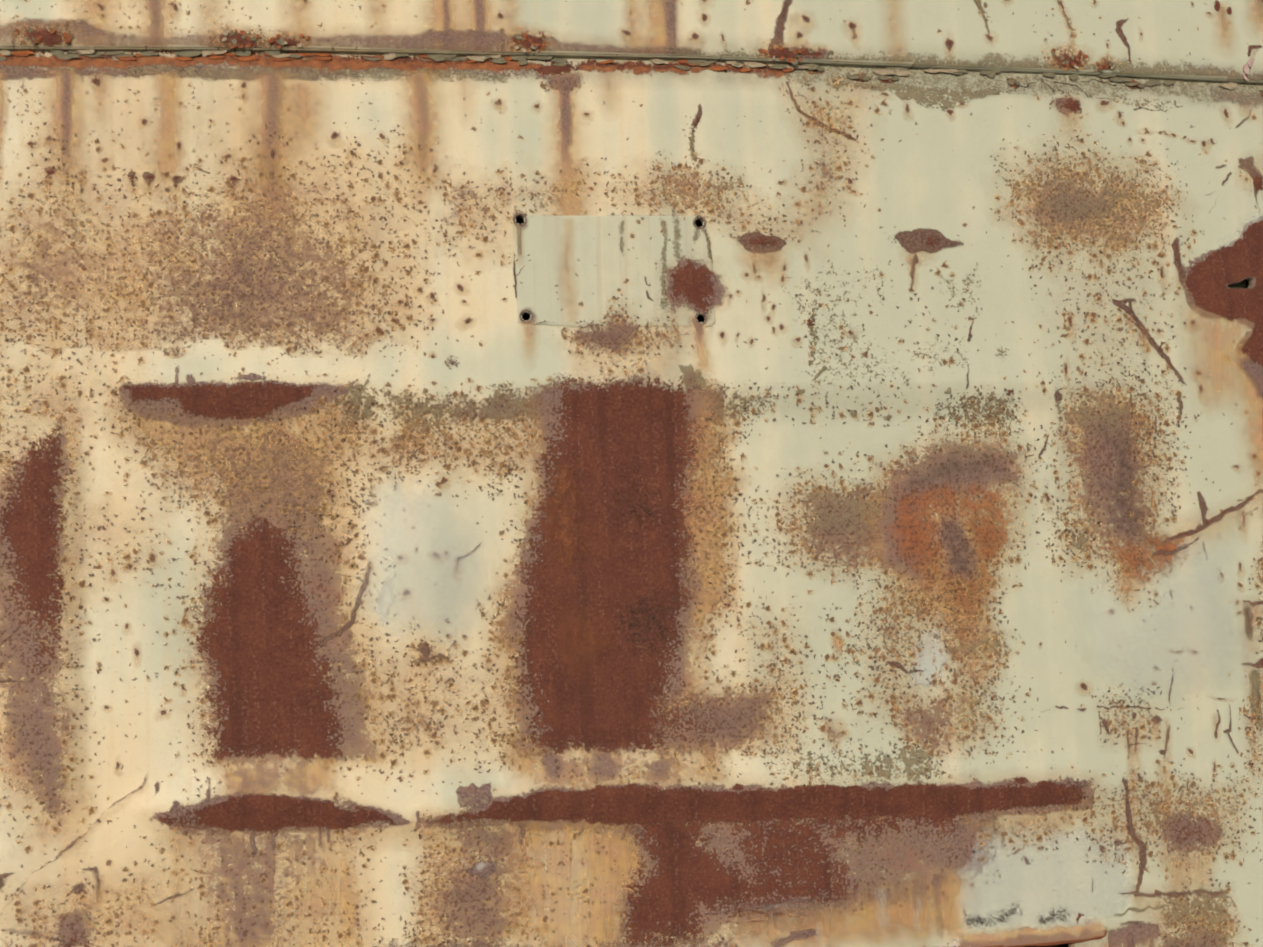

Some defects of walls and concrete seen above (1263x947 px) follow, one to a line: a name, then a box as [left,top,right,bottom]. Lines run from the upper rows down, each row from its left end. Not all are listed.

corrosion [432,0,454,33]
corrosion [470,0,489,33]
corrosion [1173,216,1263,469]
corrosion [1,867,182,947]